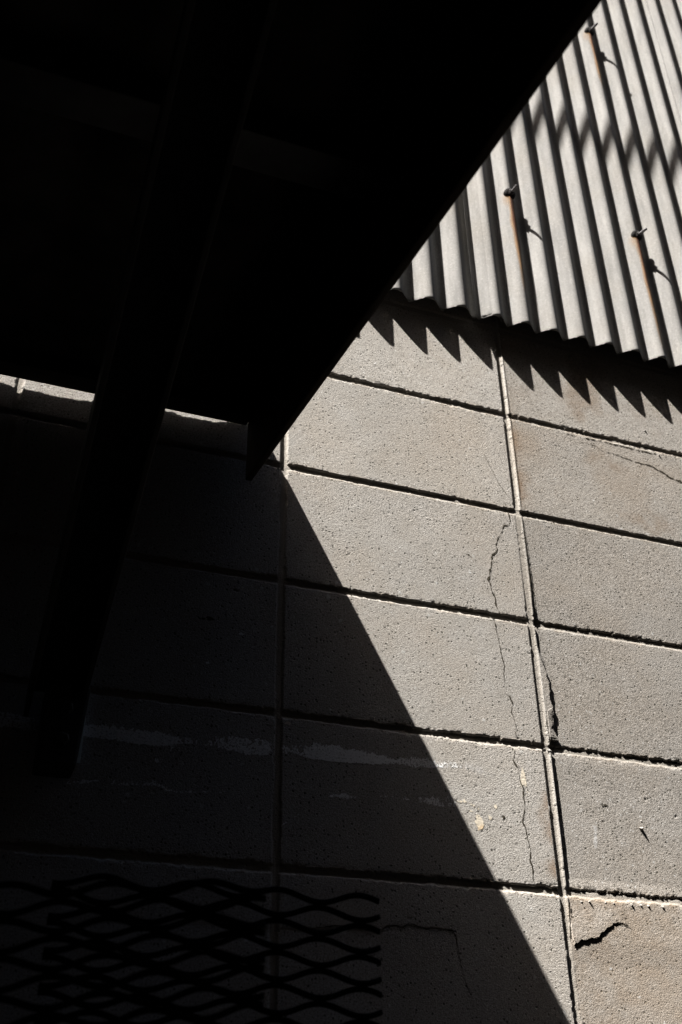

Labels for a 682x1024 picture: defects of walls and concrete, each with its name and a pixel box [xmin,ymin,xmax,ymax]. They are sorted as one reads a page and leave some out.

rust [589,33,602,79]
rust [508,196,523,271]
rust [635,237,659,329]
crack [483,339,534,881]